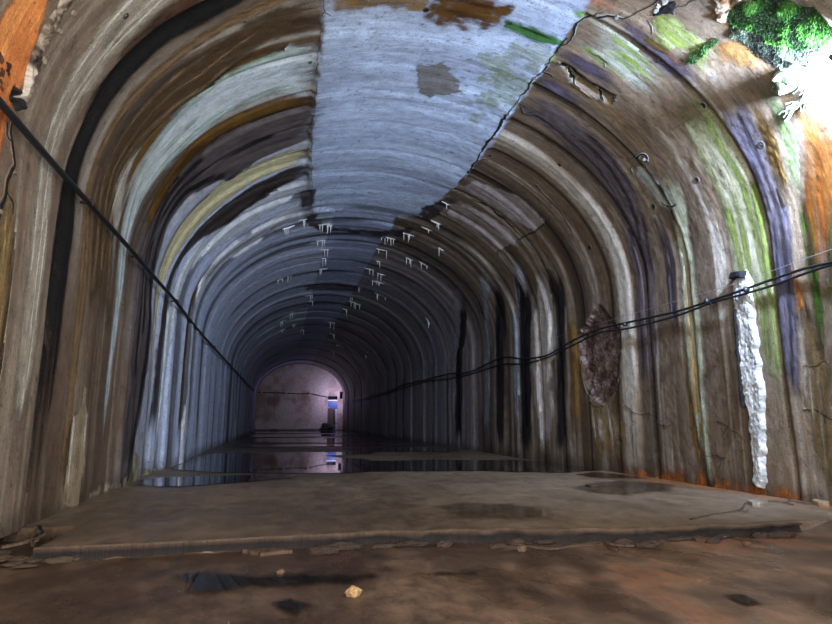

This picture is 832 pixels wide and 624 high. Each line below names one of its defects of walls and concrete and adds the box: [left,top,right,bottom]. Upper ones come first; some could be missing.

leakage [0,193,18,381]
rust [0,0,48,148]
spalling [9,0,77,112]
leakage [15,0,545,508]
crack [309,0,331,205]
crack [453,0,696,253]
spalling [579,304,621,403]
leakage [706,101,832,489]
rust [804,114,832,272]